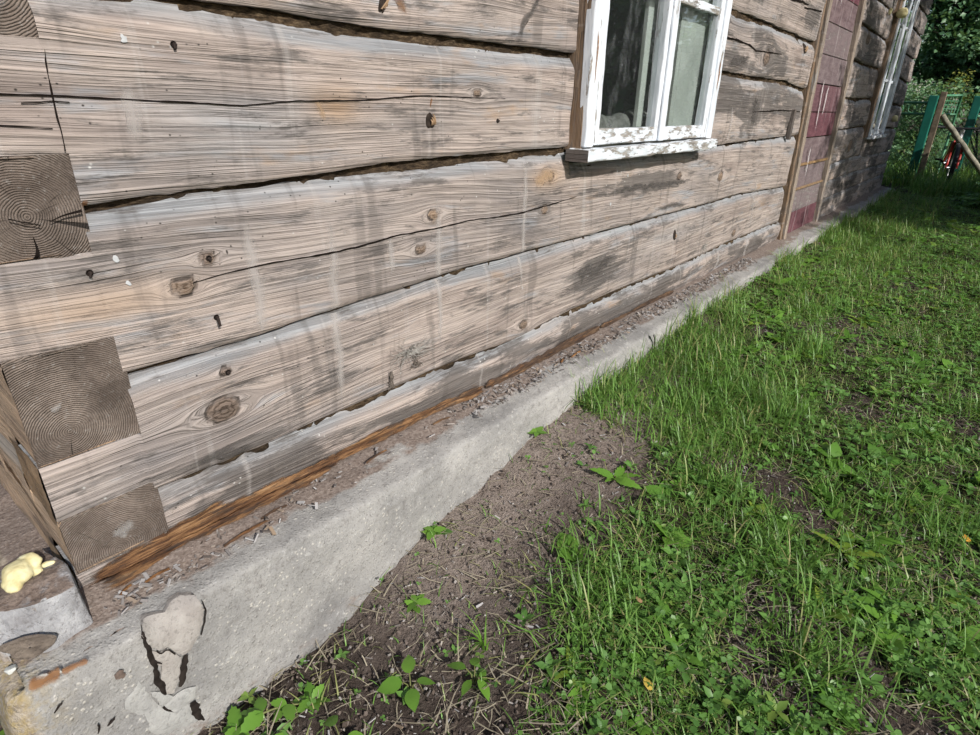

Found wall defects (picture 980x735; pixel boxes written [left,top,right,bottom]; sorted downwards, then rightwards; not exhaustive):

peeling [124,592,205,735]
crack [141,626,205,721]
crack [200,601,208,635]